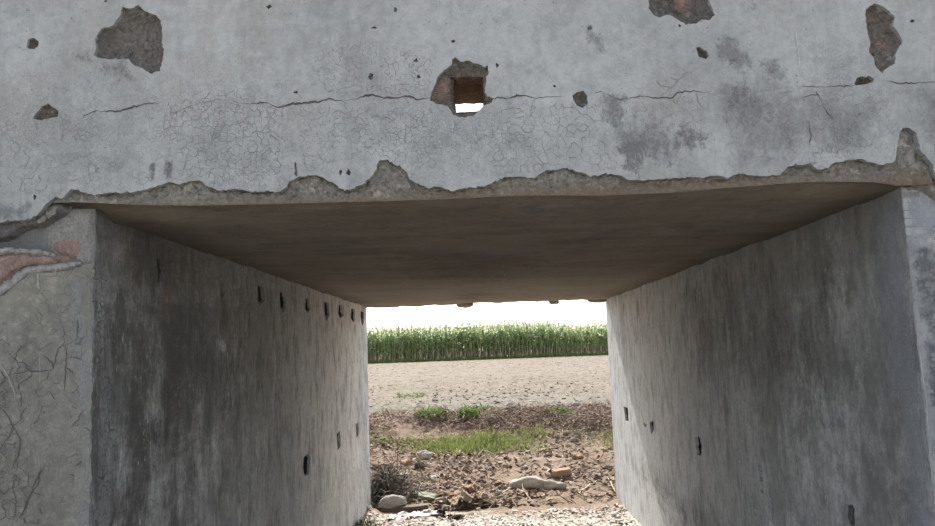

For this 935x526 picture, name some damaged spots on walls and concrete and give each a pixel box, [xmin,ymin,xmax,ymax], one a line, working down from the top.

flaking render [96,6,164,74]
flaking render [648,0,714,27]
flaking render [865,5,901,72]
crack [0,41,446,196]
spalling [430,59,499,118]
crack [491,71,855,175]
crack [891,81,934,137]
spalling [0,130,935,296]
crack [0,268,119,525]